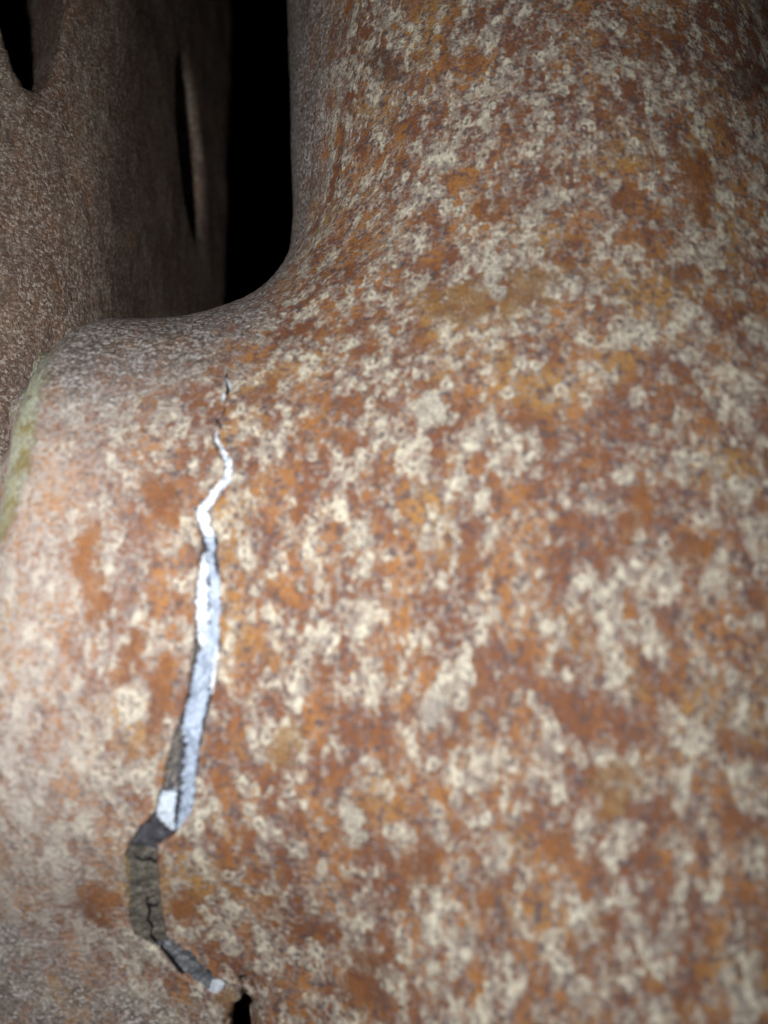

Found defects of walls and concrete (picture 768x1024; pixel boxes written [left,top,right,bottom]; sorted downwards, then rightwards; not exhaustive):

corrosion [470,197,503,221]
corrosion [141,478,179,525]
corrosion [616,487,655,543]
corrosion [68,517,111,627]
corrosion [109,631,147,688]
corrosion [144,652,173,759]
crack [124,373,234,993]
corrosion [75,881,119,925]
corrosion [171,890,203,928]
corrosion [336,949,384,1008]